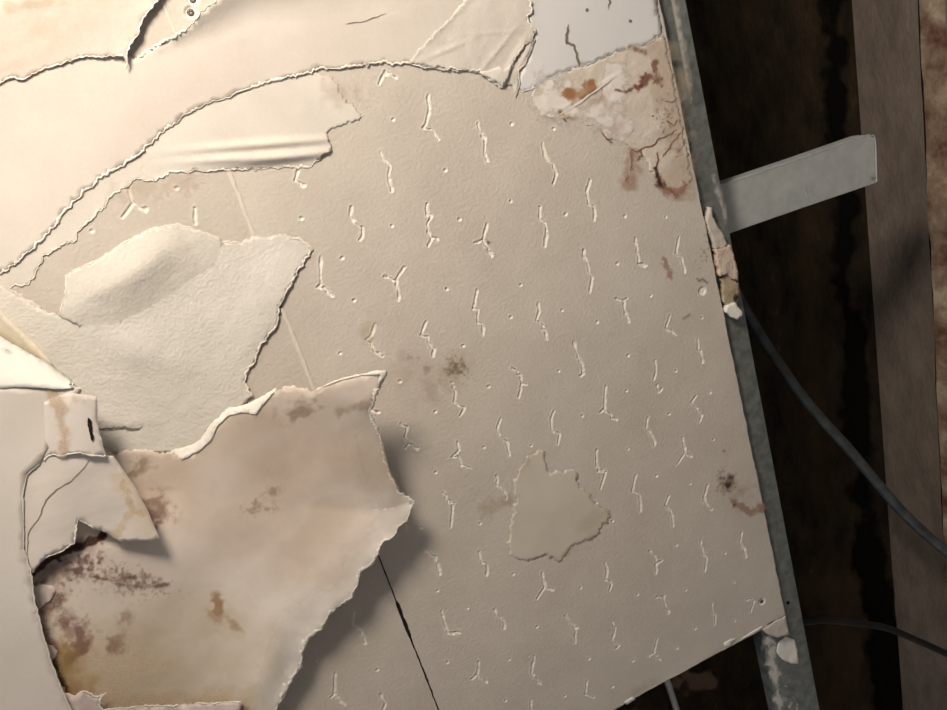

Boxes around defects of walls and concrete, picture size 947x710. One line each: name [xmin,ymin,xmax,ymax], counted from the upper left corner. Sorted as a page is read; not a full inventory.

crack [565,0,632,66]
peeling [480,37,535,98]
rust [562,79,596,100]
peeling [532,34,692,193]
rust [615,46,663,93]
crack [601,100,682,193]
rust [655,175,687,198]
water stain [142,496,165,529]
water stain [31,531,169,695]
crack [378,555,439,710]